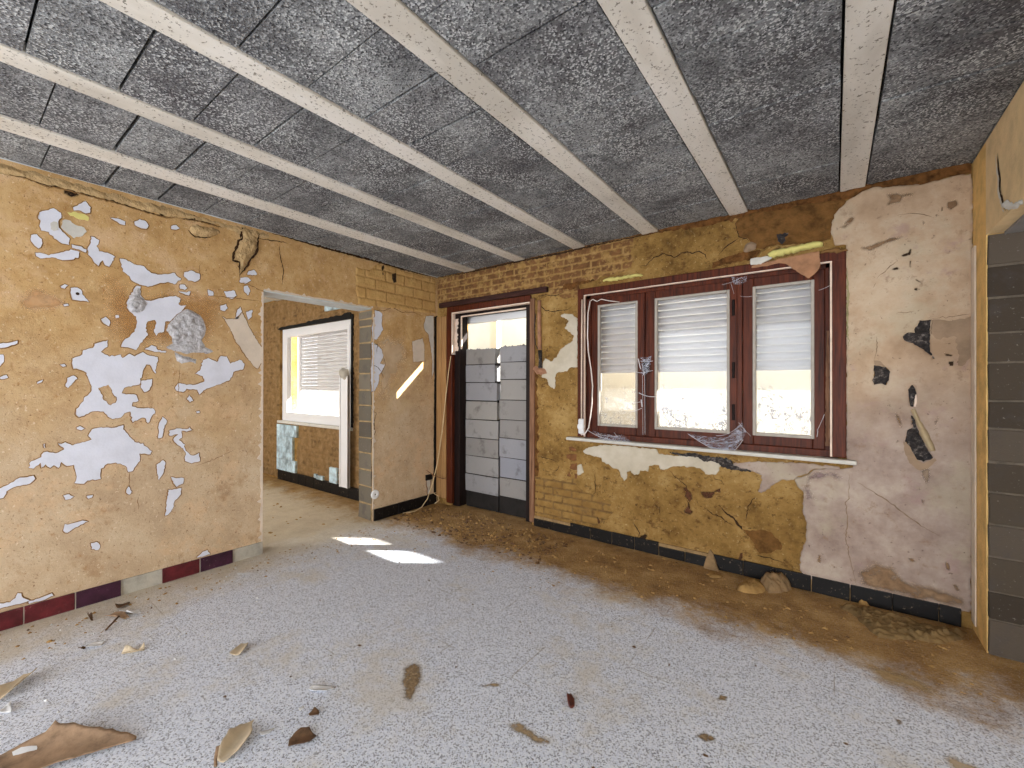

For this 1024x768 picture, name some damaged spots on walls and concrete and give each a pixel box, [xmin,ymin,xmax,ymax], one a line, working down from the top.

crack [997,153,1006,211]
flaking render [0,163,971,542]
crack [670,471,754,529]
spalling [742,527,785,556]
crack [845,476,939,578]
peeling [0,592,55,609]